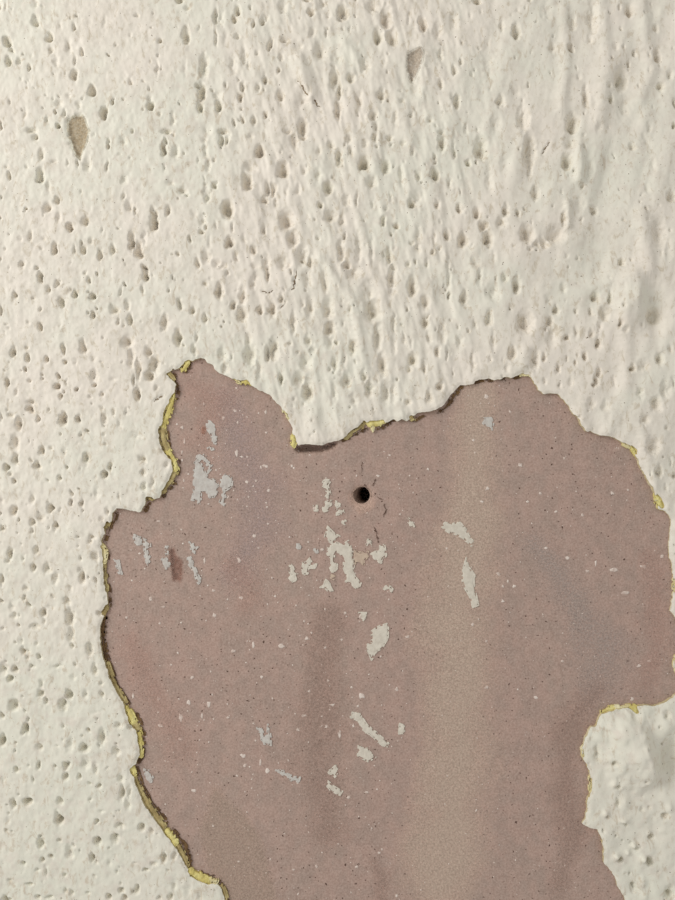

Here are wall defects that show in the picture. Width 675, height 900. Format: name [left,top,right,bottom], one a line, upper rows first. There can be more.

peeling [101,358,675,900]